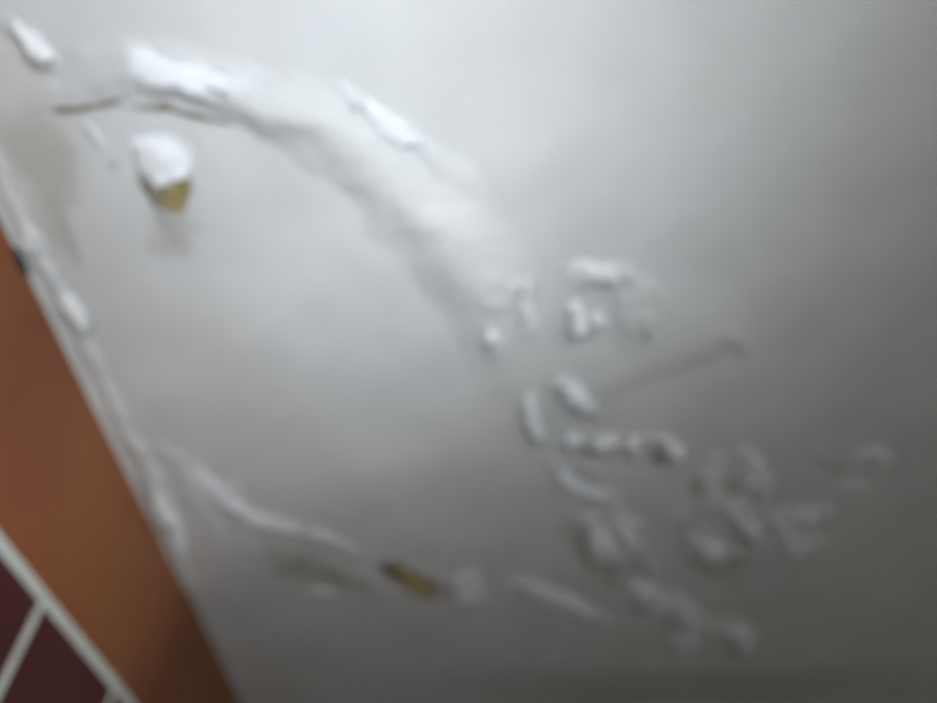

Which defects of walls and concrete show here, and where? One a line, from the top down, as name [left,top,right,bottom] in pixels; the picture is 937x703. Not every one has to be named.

peeling [0,9,139,113]
peeling [127,131,193,212]
peeling [476,276,539,376]
peeling [559,256,669,355]
peeling [518,367,690,463]
peeling [577,501,658,576]